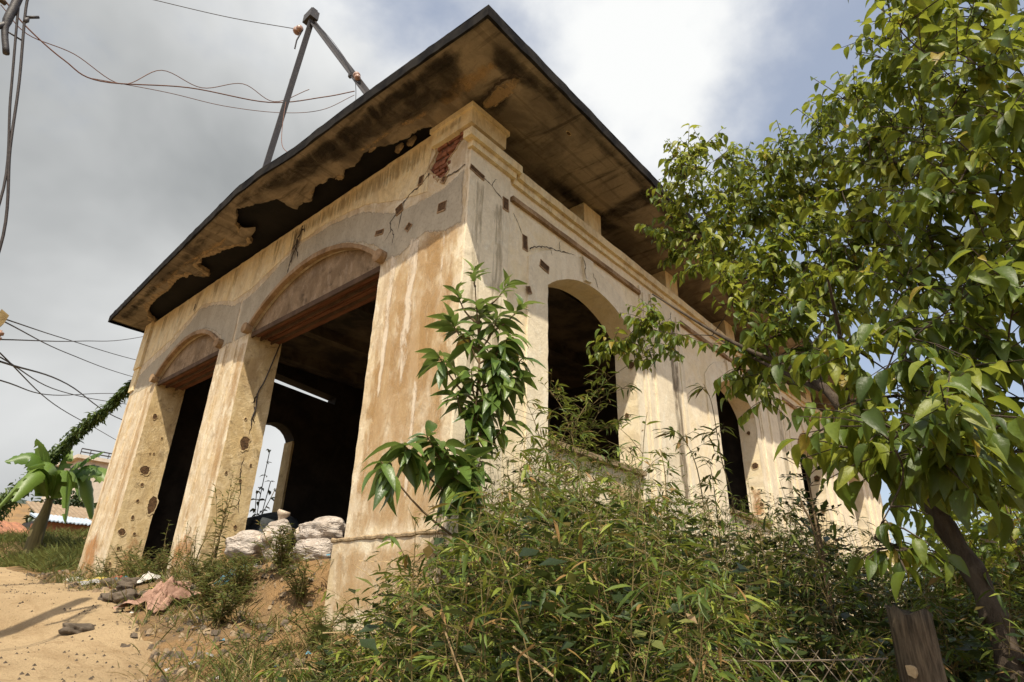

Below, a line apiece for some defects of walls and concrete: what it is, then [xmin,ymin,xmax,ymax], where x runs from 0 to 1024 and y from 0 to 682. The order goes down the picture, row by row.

damp [268,55,457,189]
damp [494,51,556,101]
flaking render [130,124,485,396]
crack [386,164,465,242]
crack [485,179,598,287]
spalling [239,435,252,467]
peeling [409,382,417,449]
spalling [116,452,159,551]